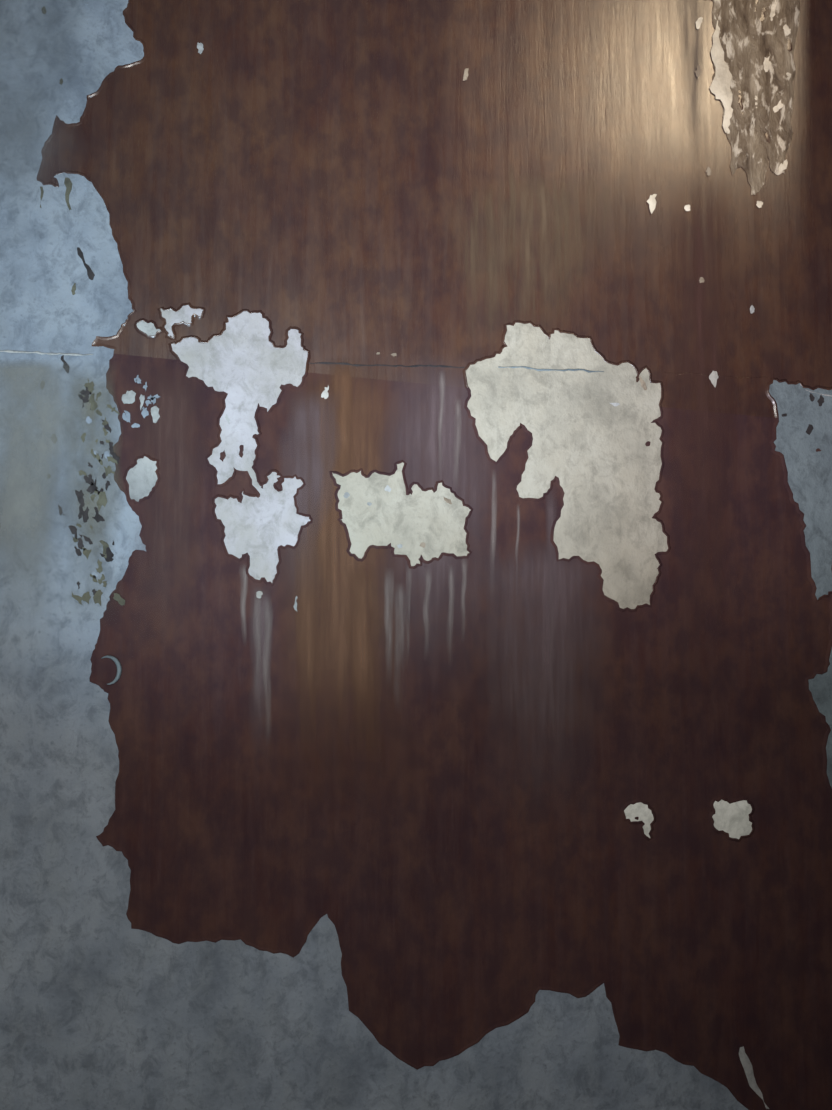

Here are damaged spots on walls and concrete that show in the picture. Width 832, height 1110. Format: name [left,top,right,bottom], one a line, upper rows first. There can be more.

peeling [36,0,147,453]
peeling [695,0,800,208]
peeling [134,303,313,586]
peeling [89,453,755,1110]
peeling [462,320,671,612]
peeling [765,378,832,798]